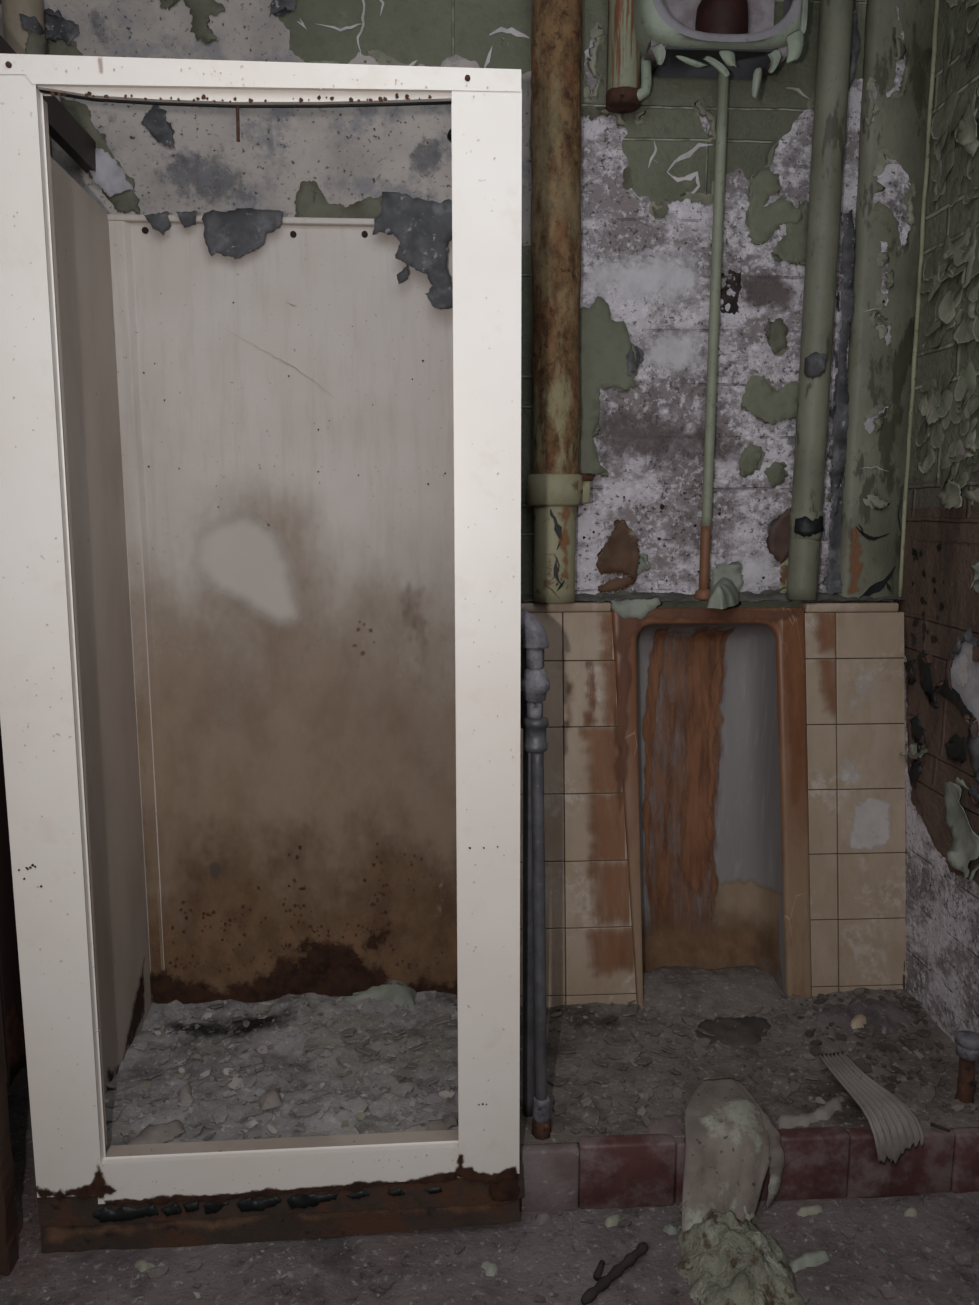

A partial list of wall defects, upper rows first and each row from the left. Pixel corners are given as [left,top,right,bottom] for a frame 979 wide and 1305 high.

peeling [18,0,425,66]
peeling [441,55,480,68]
peeling [51,96,452,217]
peeling [521,71,532,246]
peeling [575,5,916,596]
rust [818,613,836,711]
rust [585,608,801,933]
peeling [897,627,979,1047]
rust [590,931,634,971]
rust [35,1154,520,1212]